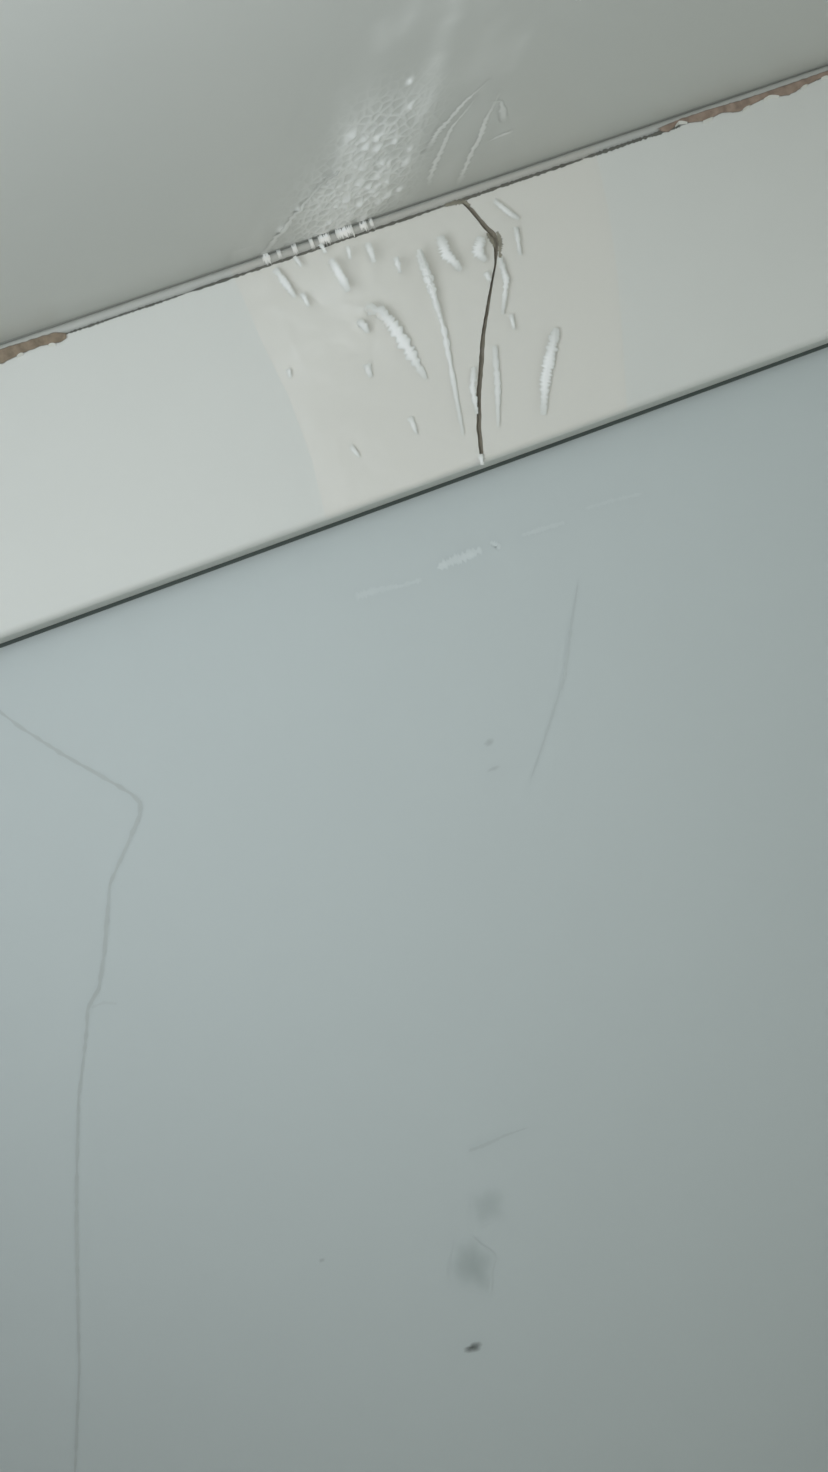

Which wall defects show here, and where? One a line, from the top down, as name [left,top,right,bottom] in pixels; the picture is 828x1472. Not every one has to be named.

peeling [659,71,828,132]
peeling [0,332,67,364]
crack [66,125,680,455]
crack [0,709,143,1472]